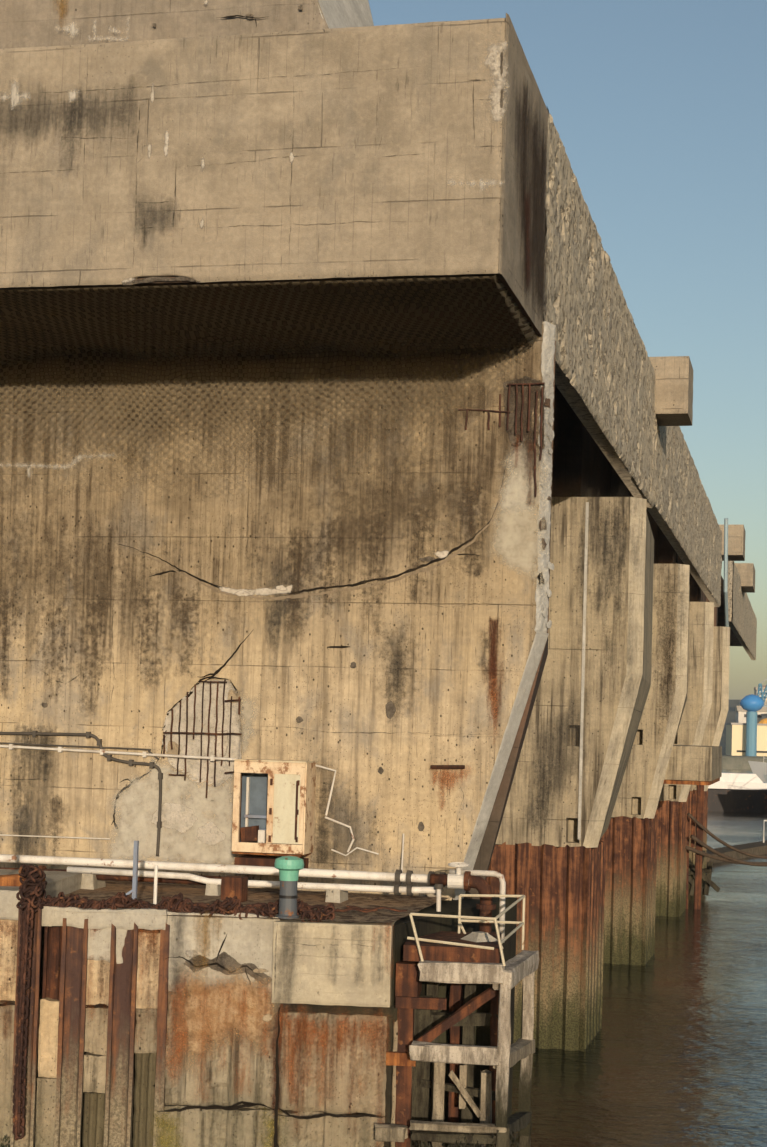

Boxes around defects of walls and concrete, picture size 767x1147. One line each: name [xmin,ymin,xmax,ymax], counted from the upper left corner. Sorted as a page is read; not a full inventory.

water stain [1,84,125,132]
spalling [485,42,508,121]
crack [117,444,512,600]
water stain [328,460,437,557]
water stain [0,532,145,691]
rust [485,620,499,718]
peeling [111,679,242,864]
crack [111,629,254,848]
rust [431,765,465,787]
peeling [179,950,283,1064]
crack [157,935,384,1147]
rust [264,1008,374,1105]